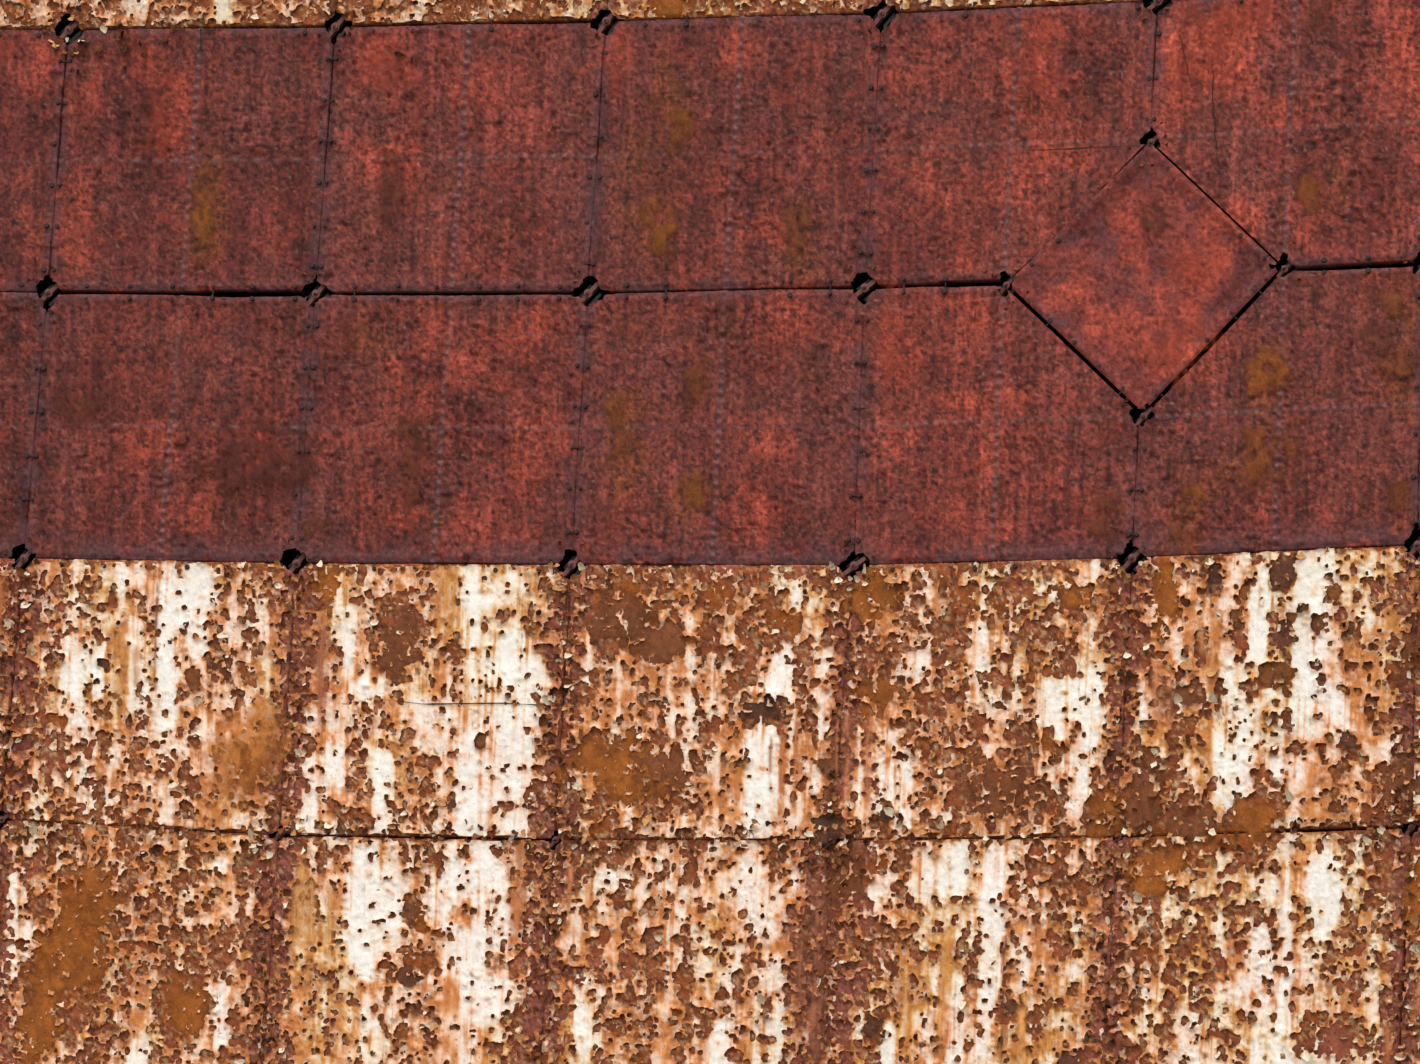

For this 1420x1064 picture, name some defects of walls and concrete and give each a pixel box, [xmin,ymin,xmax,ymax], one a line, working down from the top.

peeling [0,0,1002,73]
corrosion [308,566,340,714]
corrosion [377,607,423,683]
corrosion [585,585,690,669]
corrosion [1151,563,1182,639]
corrosion [550,729,697,808]
peeling [0,525,1420,1064]
corrosion [731,696,798,789]
corrosion [802,809,866,923]
corrosion [962,759,1046,825]
corrosion [1087,753,1276,896]
corrosion [16,864,121,1064]